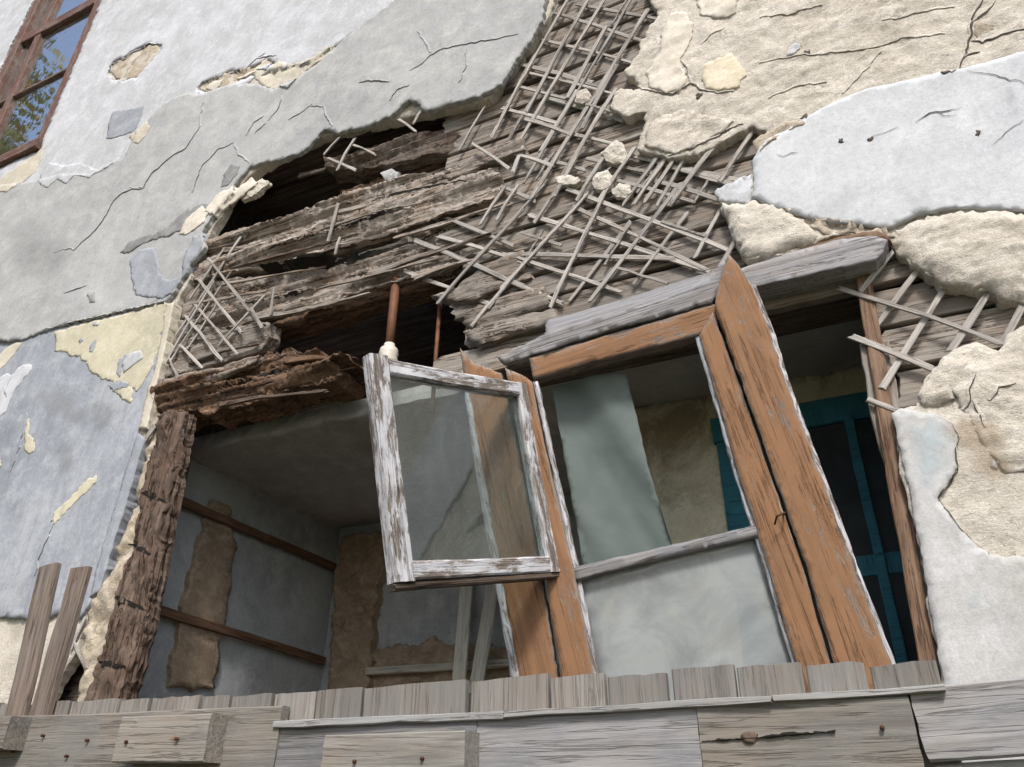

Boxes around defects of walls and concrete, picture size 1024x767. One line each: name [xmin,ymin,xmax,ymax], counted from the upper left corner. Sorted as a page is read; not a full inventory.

crack [107,42,162,73]
flaking render [200,46,335,92]
crack [359,31,518,100]
flaking render [645,0,738,94]
flaking render [695,53,747,100]
crack [759,0,1024,98]
crack [53,52,333,253]
flaking render [715,174,753,204]
crack [236,179,474,303]
peeling [54,163,258,403]
peeling [0,342,32,416]
peeling [50,476,97,524]